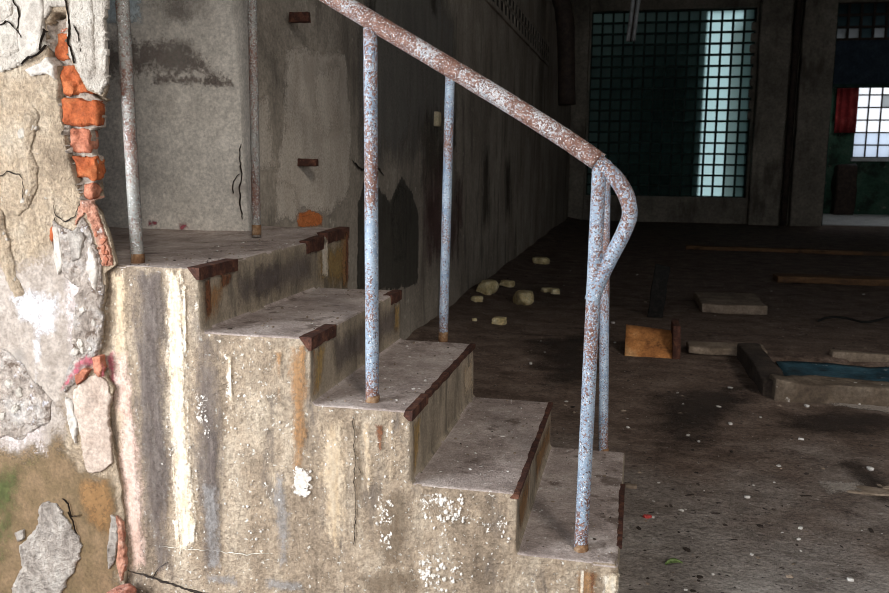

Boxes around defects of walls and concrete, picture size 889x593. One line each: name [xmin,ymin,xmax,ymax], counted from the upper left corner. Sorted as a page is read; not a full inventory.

crack [0,0,81,64]
damp [108,40,119,74]
damp [132,39,233,86]
crack [232,145,243,219]
peeling [49,196,113,473]
peeling [0,348,52,440]
damp [0,254,235,593]
rust [291,346,325,470]
crack [128,562,204,593]